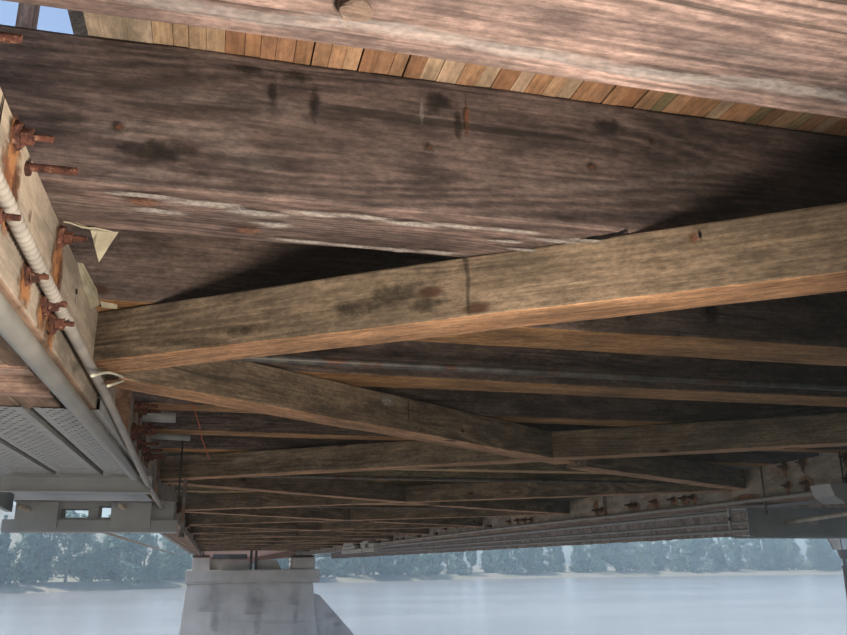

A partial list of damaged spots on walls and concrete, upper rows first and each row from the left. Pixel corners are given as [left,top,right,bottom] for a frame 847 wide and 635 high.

corrosion [3,117,22,202]
corrosion [19,260,55,351]
corrosion [51,224,63,293]
crack [462,258,470,310]